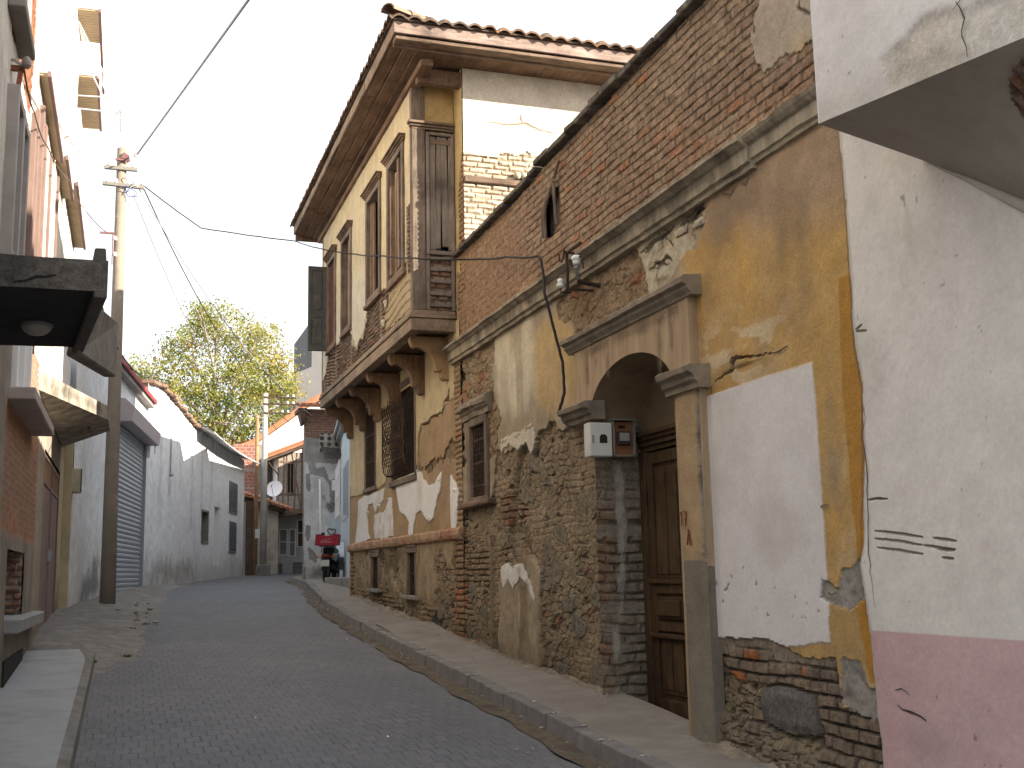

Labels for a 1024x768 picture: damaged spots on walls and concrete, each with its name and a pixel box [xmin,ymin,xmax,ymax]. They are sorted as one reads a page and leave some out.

flaking render [750,0,813,72]
crack [487,115,552,133]
flaking render [556,202,707,334]
crack [711,346,788,393]
flaking render [306,458,335,505]
spalling [350,341,602,688]
flaking render [819,556,865,611]
spalling [719,636,884,768]